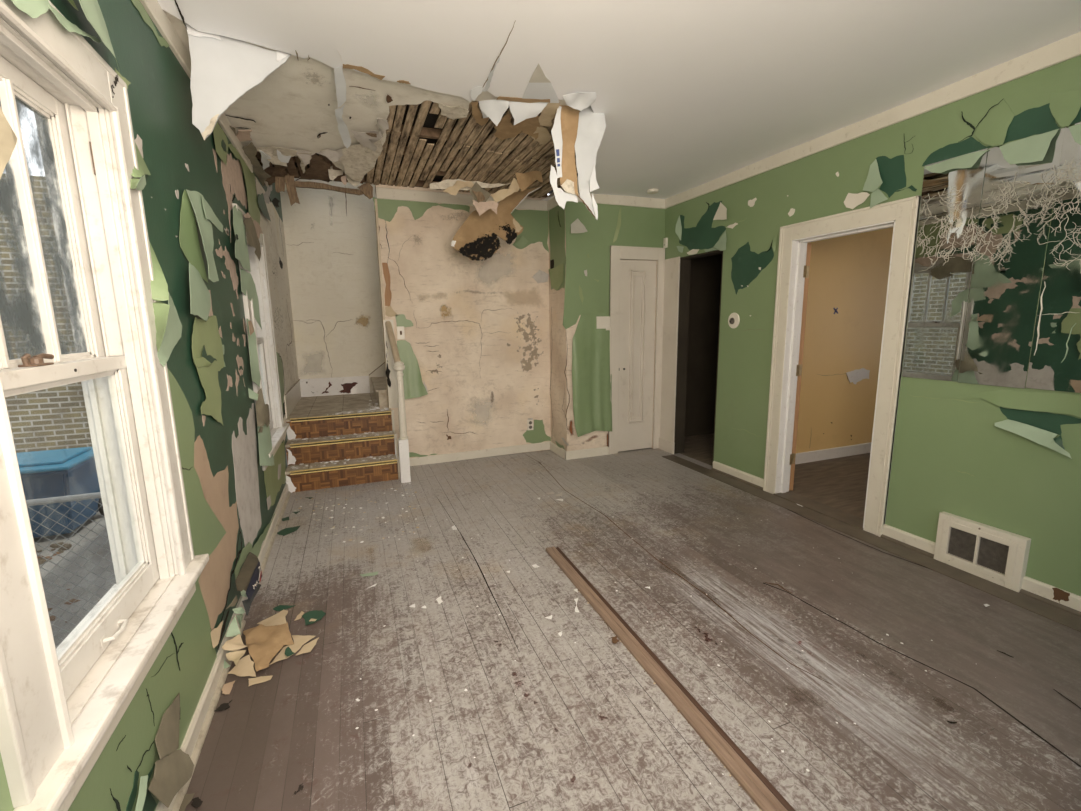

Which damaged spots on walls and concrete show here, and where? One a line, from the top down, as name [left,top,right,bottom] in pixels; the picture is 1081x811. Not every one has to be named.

peeling [11,0,131,89]
peeling [164,10,190,54]
peeling [130,134,152,198]
peeling [844,135,917,209]
peeling [922,90,1081,173]
peeling [149,55,498,649]
crack [384,341,392,387]
crack [390,239,512,440]
peeling [507,201,777,451]
peeling [940,390,1081,459]
crack [146,632,183,726]
peeling [110,693,194,811]